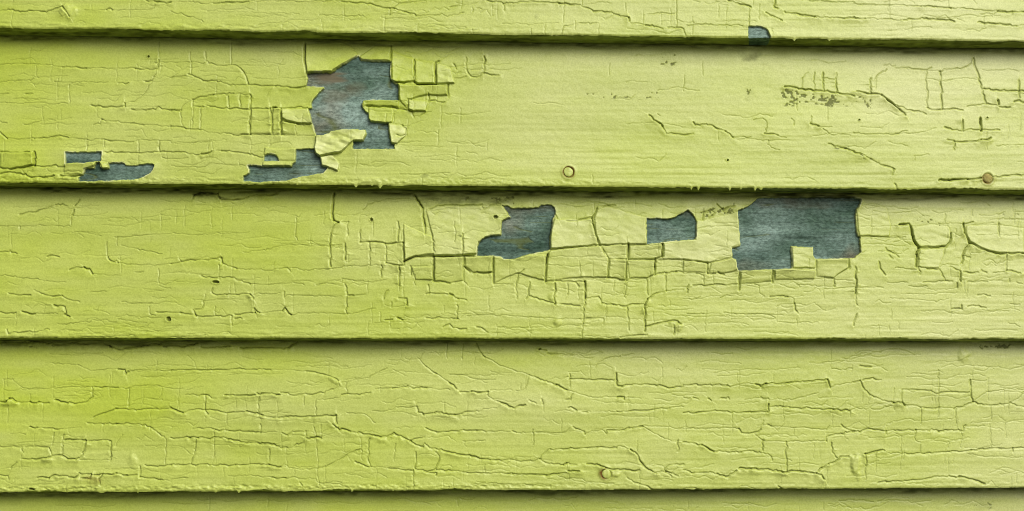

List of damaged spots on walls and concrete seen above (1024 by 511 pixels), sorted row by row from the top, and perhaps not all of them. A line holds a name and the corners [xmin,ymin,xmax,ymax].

crack [0,0,1024,37]
peeling [748,26,771,46]
peeling [64,151,154,182]
crack [0,41,315,179]
peeling [243,42,455,183]
crack [351,44,500,150]
crack [648,57,1024,189]
peeling [404,196,891,283]
crack [0,189,1024,490]